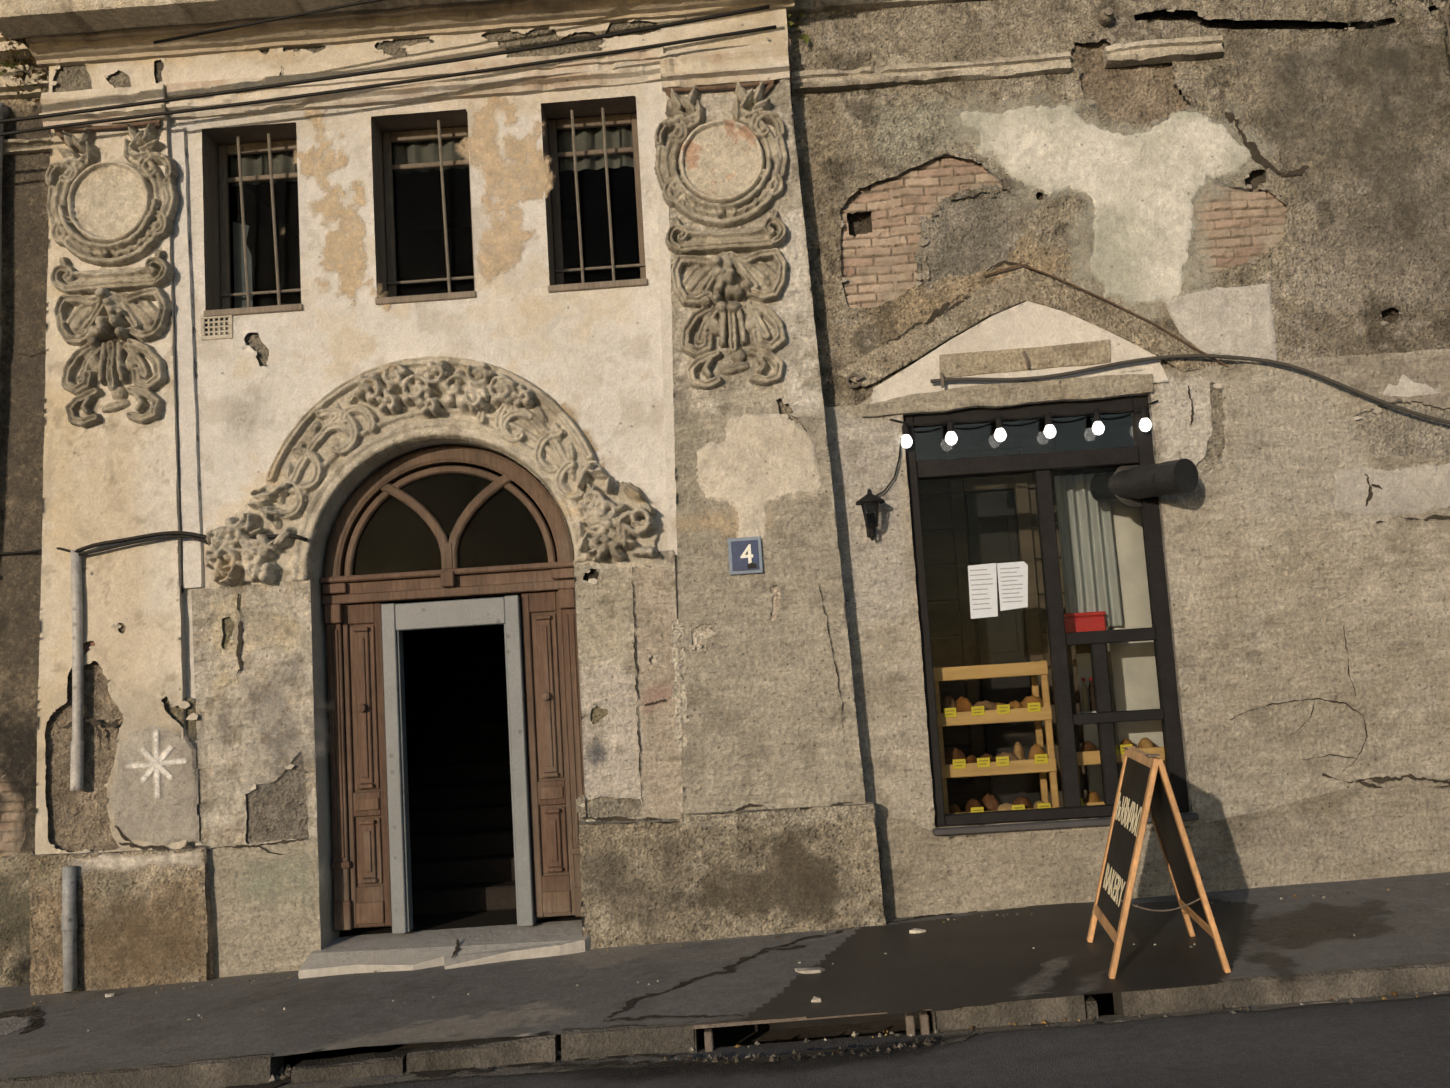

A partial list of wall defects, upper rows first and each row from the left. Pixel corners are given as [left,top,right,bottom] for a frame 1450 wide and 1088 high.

peeling [481,19,660,58]
flaking render [1071,35,1191,128]
peeling [459,96,552,281]
flaking render [838,154,1043,308]
damp [0,107,51,854]
flaking render [45,641,124,855]
flaking render [242,751,309,844]
crack [1230,627,1450,788]
damp [12,958,30,986]
crack [401,927,936,1078]
crack [887,910,981,923]
crack [224,1077,293,1088]